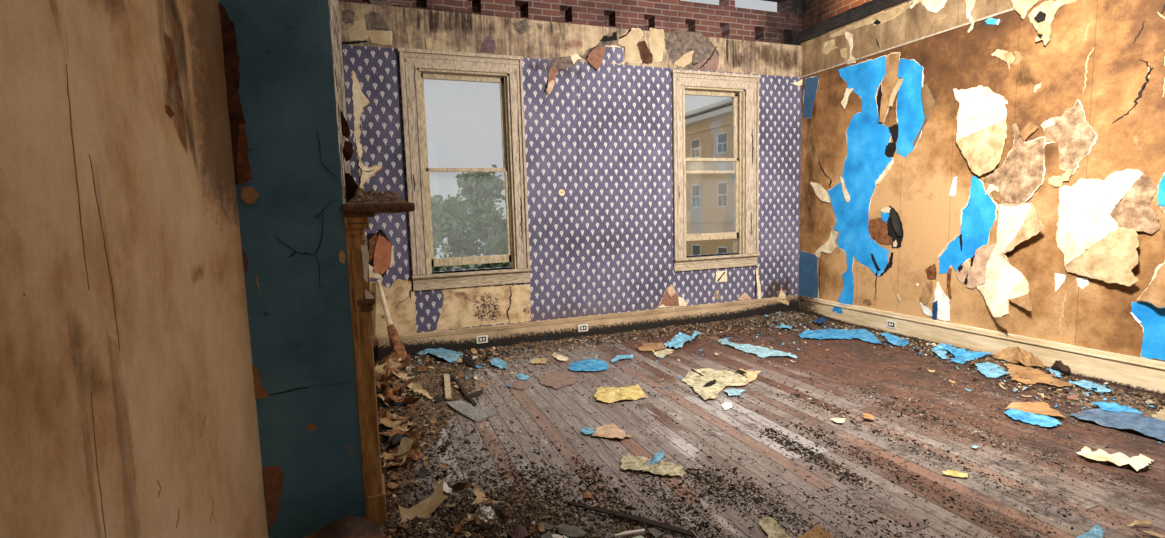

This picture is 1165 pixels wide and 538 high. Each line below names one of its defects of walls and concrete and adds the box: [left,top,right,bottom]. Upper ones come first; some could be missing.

damp [165,0,195,155]
spalling [218,3,260,204]
crack [274,130,362,285]
peeling [340,110,354,175]
spalling [550,28,720,71]
peeling [821,0,947,314]
peeling [937,175,998,274]
spalling [965,0,975,33]
crack [1112,4,1165,124]
peeling [1157,173,1165,206]
peeling [1130,301,1165,360]
crack [269,382,348,396]